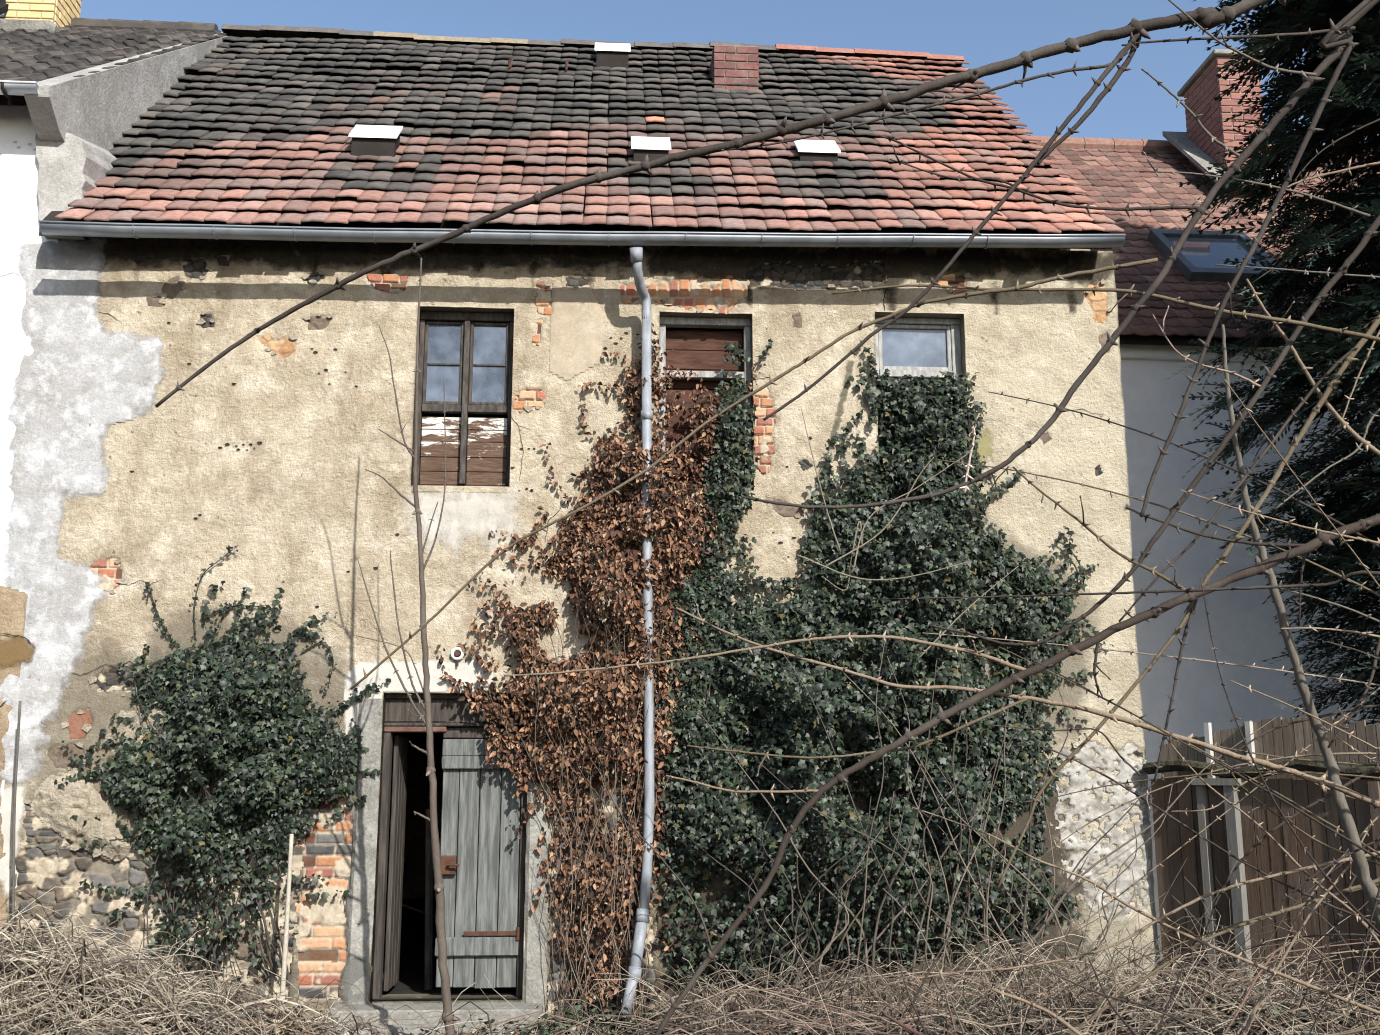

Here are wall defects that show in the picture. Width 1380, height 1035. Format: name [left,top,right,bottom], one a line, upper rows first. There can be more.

flaking render [367,273,408,294]
flaking render [620,262,885,314]
flaking render [259,313,337,358]
flaking render [513,388,547,413]
flaking render [753,373,813,476]
flaking render [766,496,811,518]
flaking render [90,558,129,594]
flaking render [0,586,354,1007]
flaking render [1054,742,1152,919]